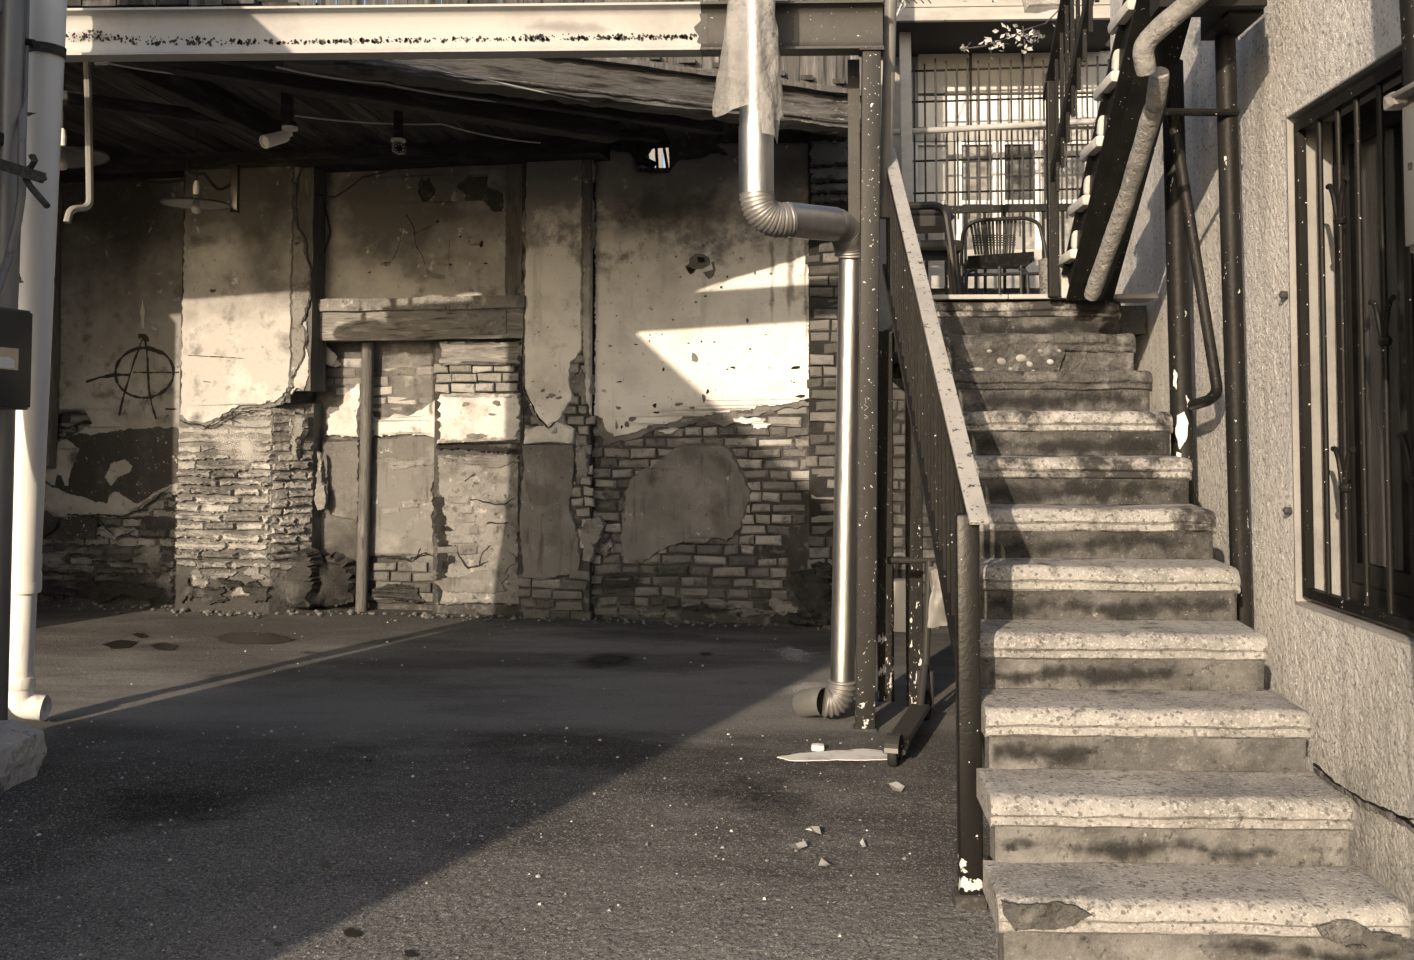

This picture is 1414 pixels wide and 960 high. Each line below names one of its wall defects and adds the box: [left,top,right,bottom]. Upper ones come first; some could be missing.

flaking render [37,321,809,620]
crack [1313,763,1414,828]